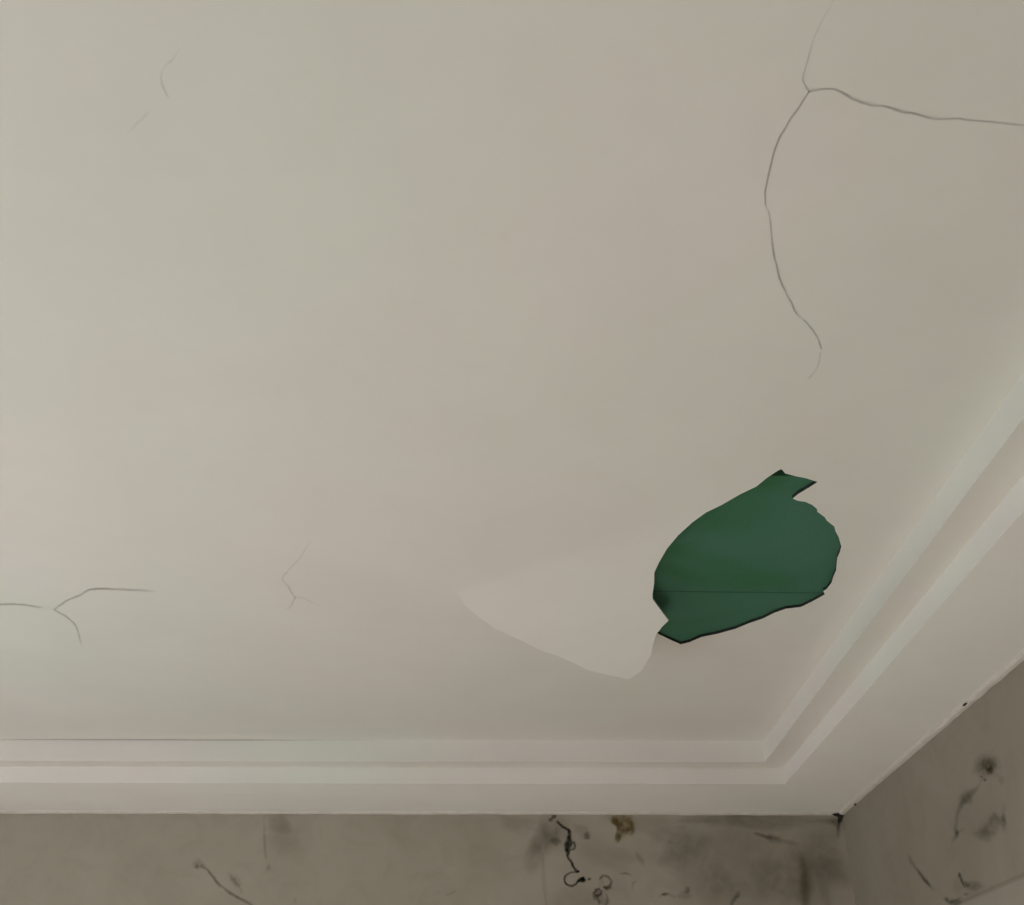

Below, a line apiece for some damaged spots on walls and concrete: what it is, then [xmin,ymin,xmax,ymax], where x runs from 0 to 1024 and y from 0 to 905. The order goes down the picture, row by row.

flaking render [455,469,841,679]